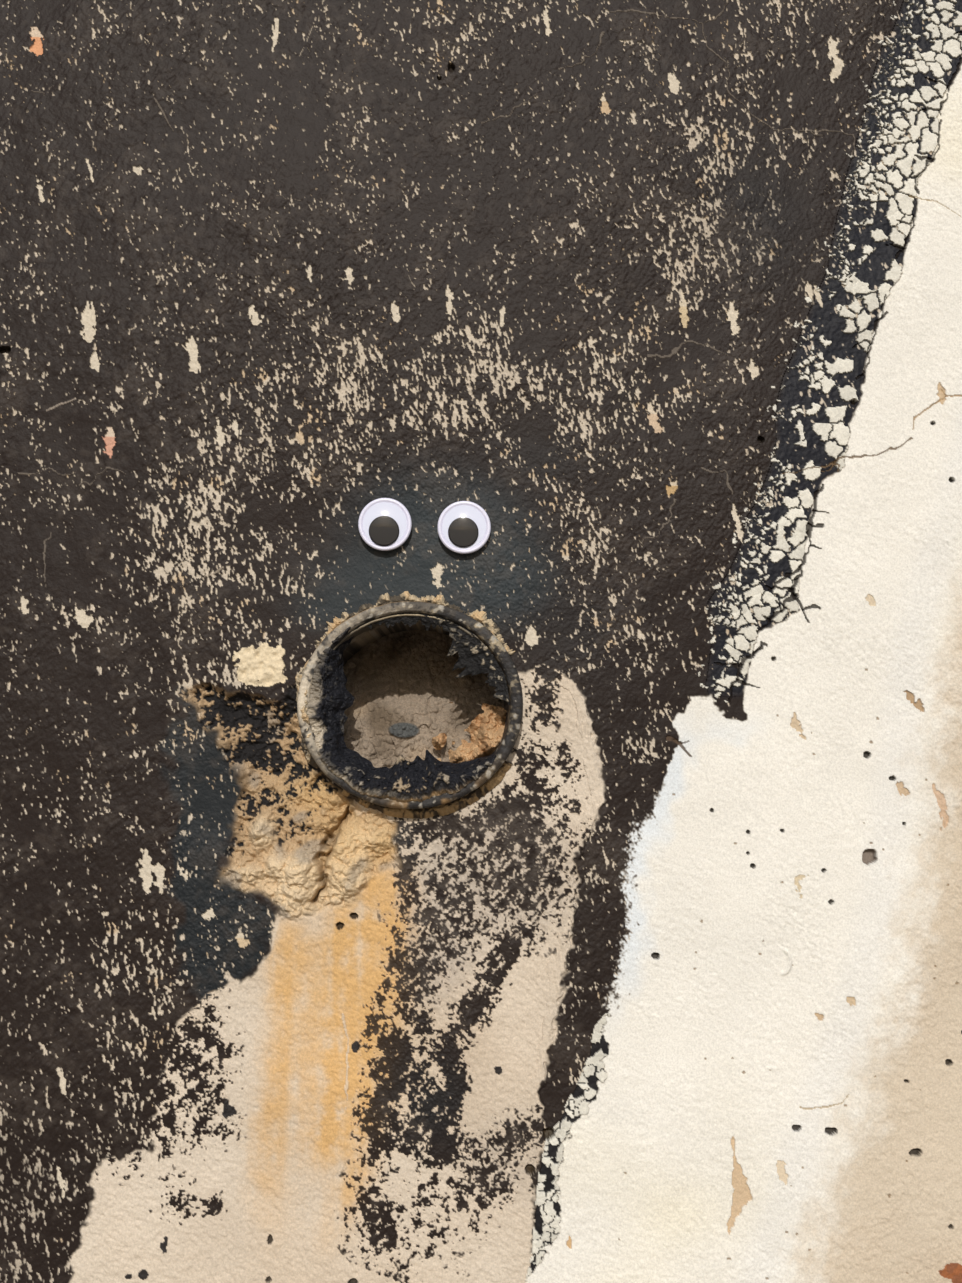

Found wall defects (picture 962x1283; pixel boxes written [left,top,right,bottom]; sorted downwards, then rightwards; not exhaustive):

peeling [828,36,845,83]
peeling [600,92,612,115]
peeling [657,70,809,328]
peeling [805,281,823,308]
peeling [727,302,741,336]
peeling [749,359,759,380]
crack [559,0,962,703]
peeling [666,481,678,497]
peeling [732,504,745,544]
peeling [70,543,662,1283]
rust [239,862,424,1255]
peeling [727,1137,753,1235]